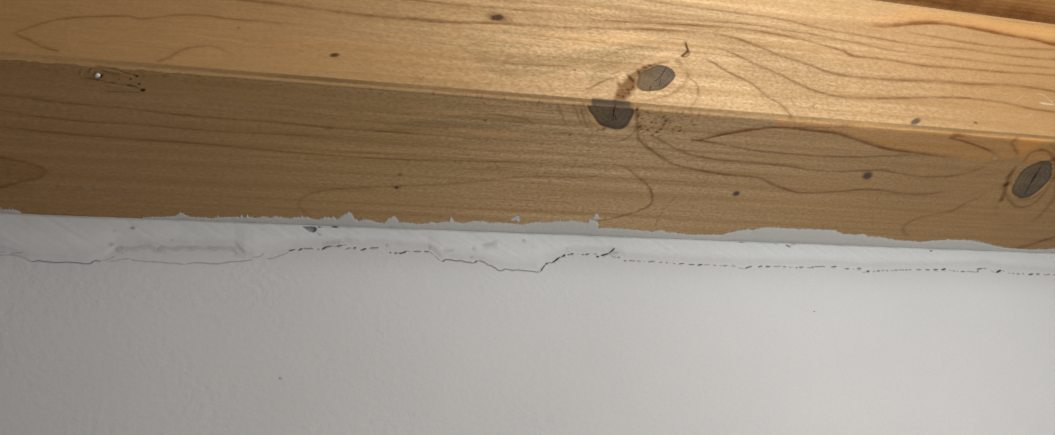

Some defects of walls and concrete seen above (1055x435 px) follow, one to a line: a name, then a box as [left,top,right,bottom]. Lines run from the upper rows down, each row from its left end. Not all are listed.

crack [0,244,1055,275]